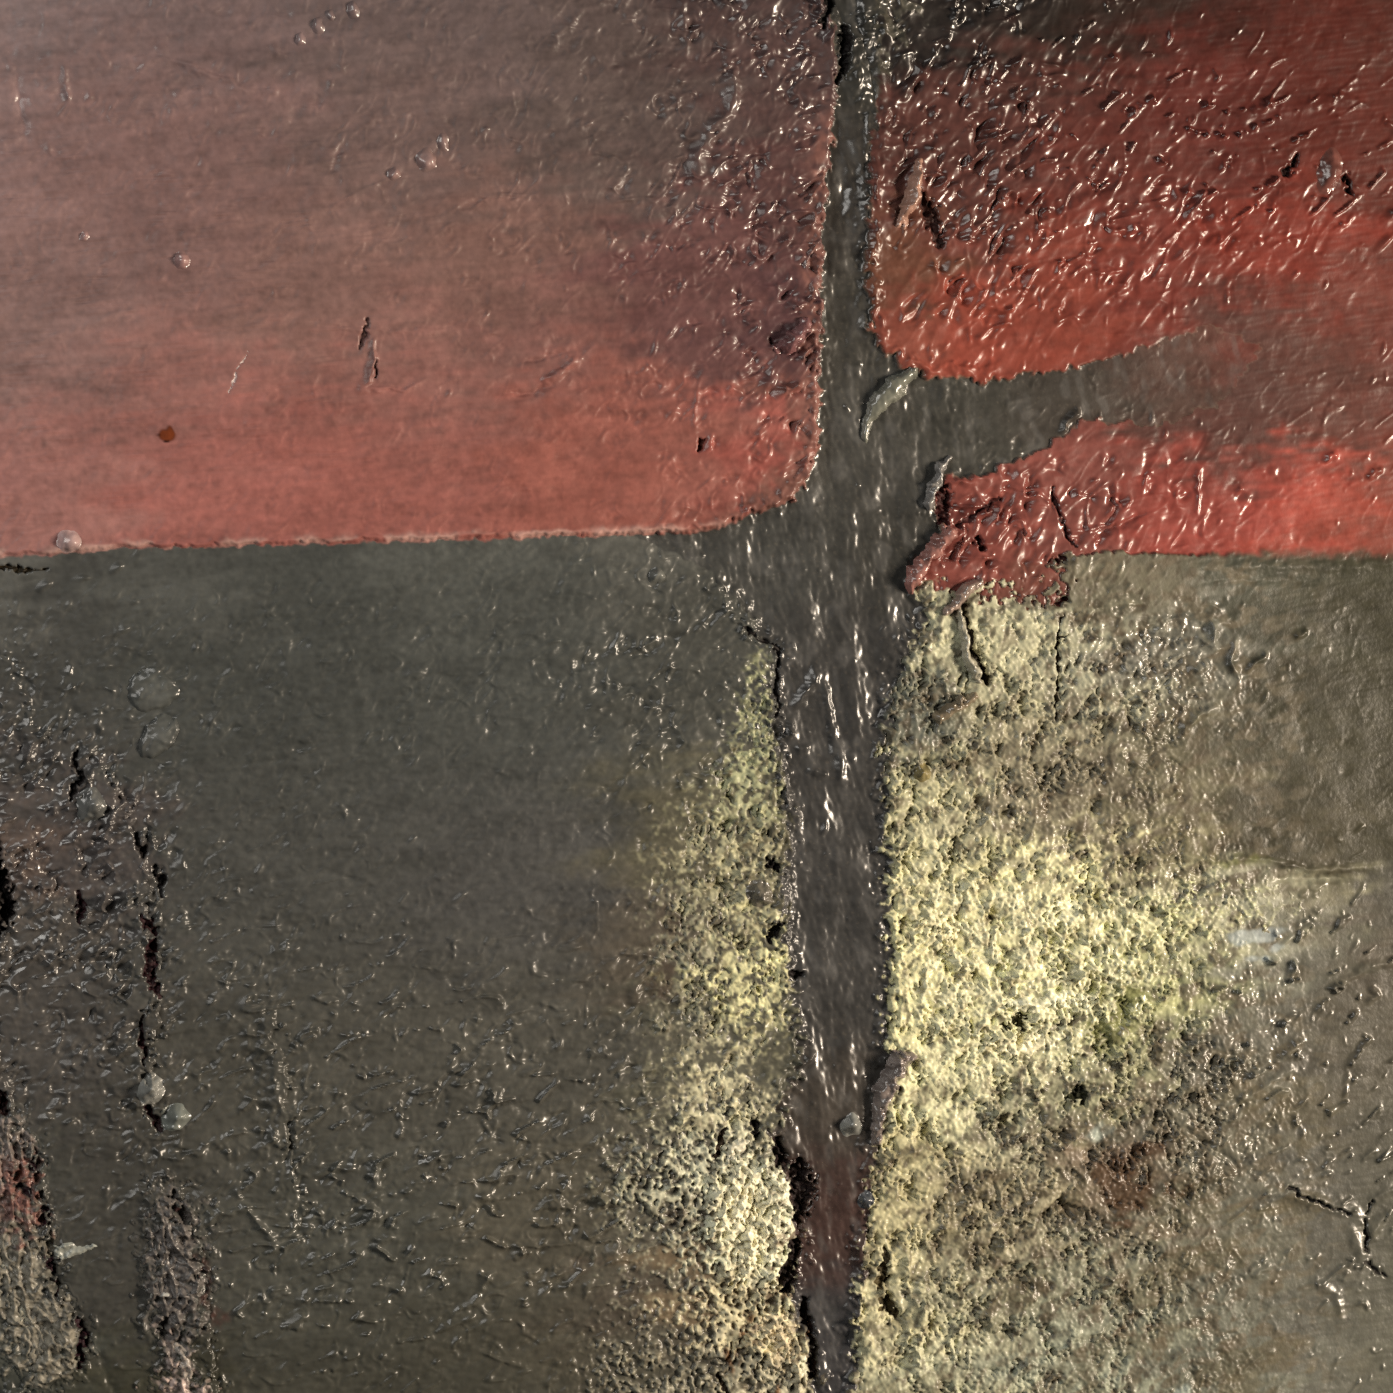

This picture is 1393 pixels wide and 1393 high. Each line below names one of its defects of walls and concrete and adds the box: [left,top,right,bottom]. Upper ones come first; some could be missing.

crack [0,564,49,573]
crack [742,626,782,718]
crack [69,750,85,801]
crack [0,847,16,935]
crack [75,890,88,925]
crack [134,832,167,1066]
crack [143,1104,163,1133]
crack [1286,1186,1387,1277]